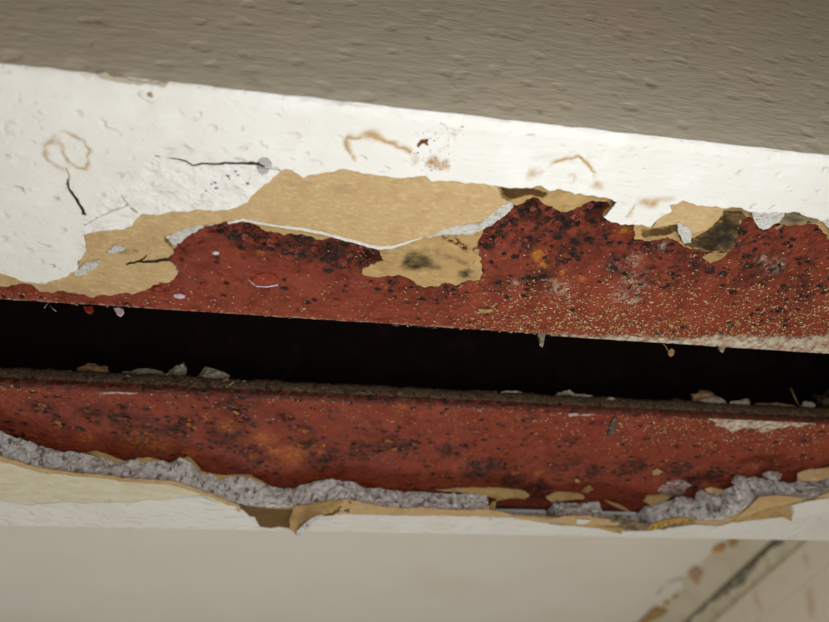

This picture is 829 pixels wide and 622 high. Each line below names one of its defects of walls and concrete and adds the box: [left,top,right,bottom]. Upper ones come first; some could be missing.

crack [156,155,280,175]
damp [344,135,412,159]
crack [66,167,86,215]
rust [218,223,380,267]
peeling [0,156,615,298]
rust [479,197,604,267]
rust [610,226,674,274]
peeling [633,200,829,252]
peeling [0,456,241,512]
peeling [789,498,829,516]